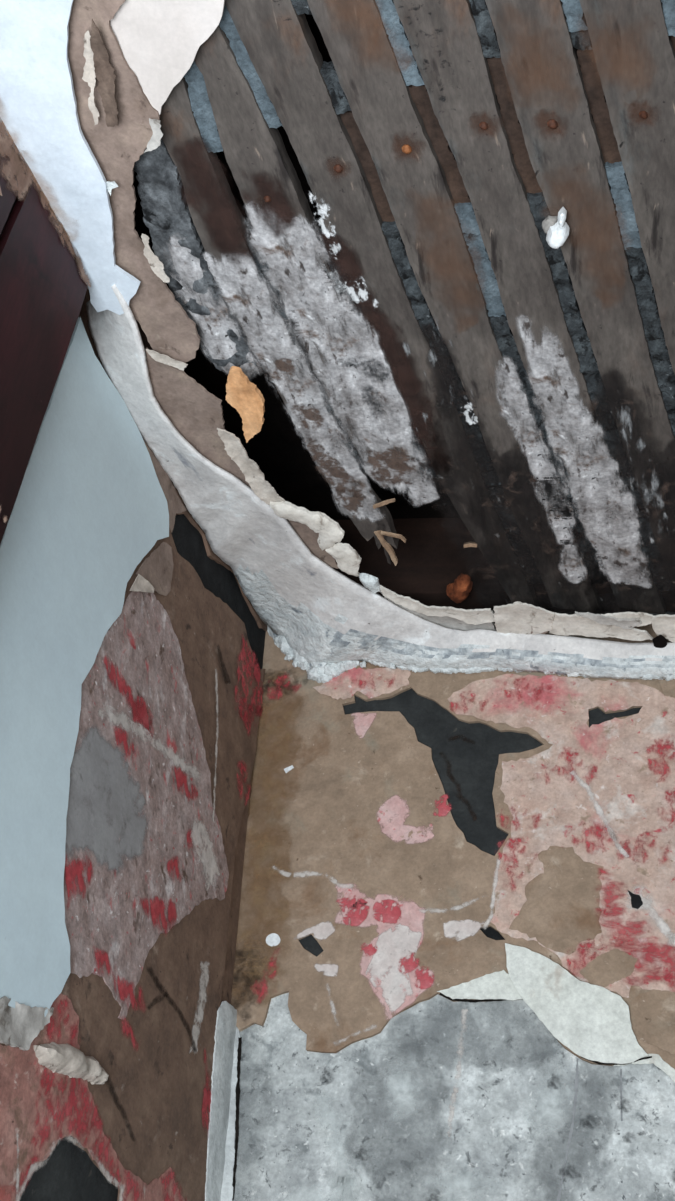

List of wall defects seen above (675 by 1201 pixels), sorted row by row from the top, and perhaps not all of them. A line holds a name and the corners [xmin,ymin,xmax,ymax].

peeling [0,120,91,287]
peeling [68,0,675,643]
damp [168,138,675,615]
peeling [64,574,229,1049]
peeling [235,638,675,1083]
peeling [0,993,186,1201]
peeling [202,1001,241,1201]